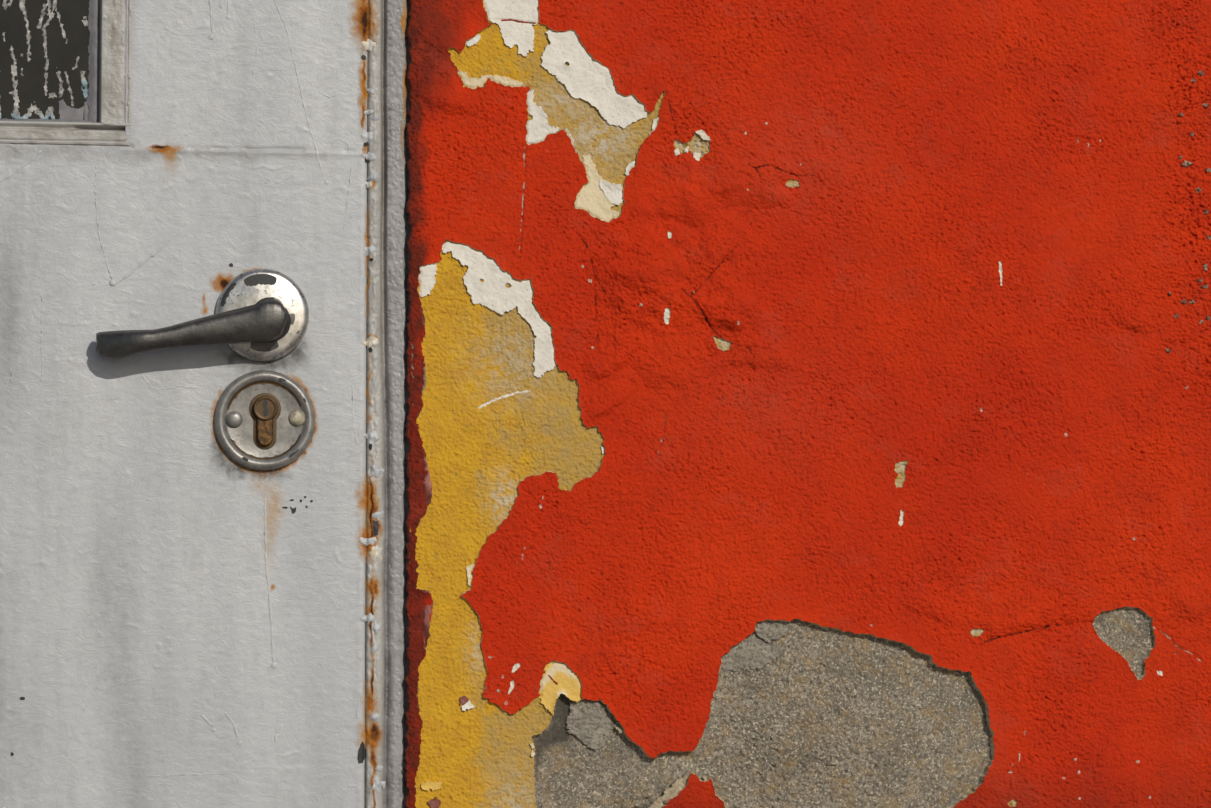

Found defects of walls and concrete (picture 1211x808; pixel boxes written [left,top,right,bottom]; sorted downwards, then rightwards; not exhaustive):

rust [353,0,375,41]
rust [360,61,368,126]
peeling [448,0,665,222]
rust [151,145,176,158]
peeling [674,130,711,161]
rust [360,482,381,555]
peeling [410,239,995,808]
rust [367,580,378,647]
crack [984,621,1093,643]
spalling [1092,606,1163,680]
rust [362,668,380,808]